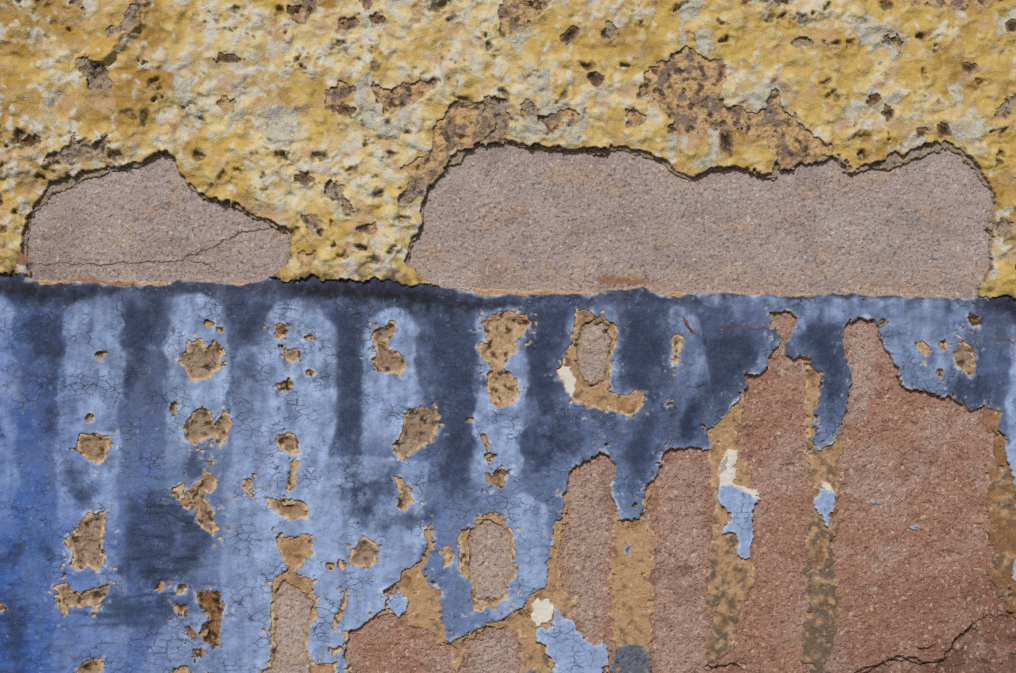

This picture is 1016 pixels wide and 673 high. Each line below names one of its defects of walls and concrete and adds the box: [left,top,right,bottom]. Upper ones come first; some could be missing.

peeling [325,72,436,140]
spalling [398,0,1016,298]
spalling [22,132,316,287]
peeling [164,402,233,545]
peeling [234,432,309,520]
leakage [352,475,392,513]
spalling [259,308,1016,673]
peeling [48,510,116,617]
leakage [127,499,208,587]
peeling [153,580,225,673]
crack [701,661,742,669]
crack [854,622,976,673]